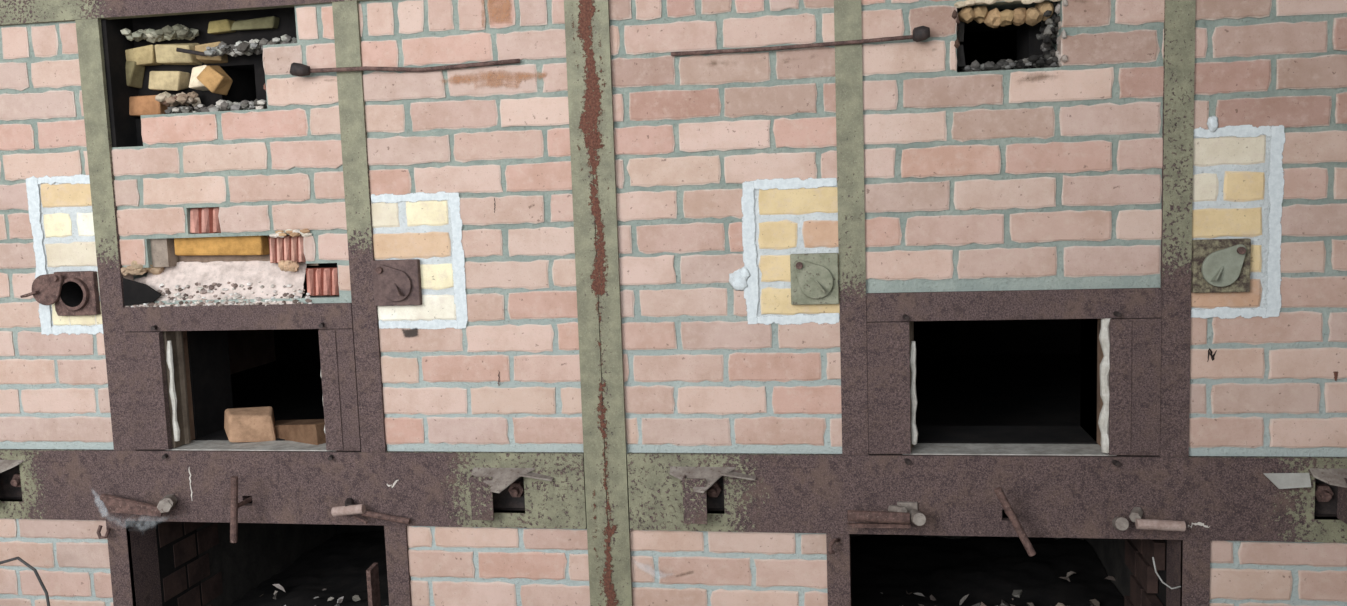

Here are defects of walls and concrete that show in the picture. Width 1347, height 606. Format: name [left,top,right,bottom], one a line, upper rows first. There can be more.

rust [571,0,618,606]